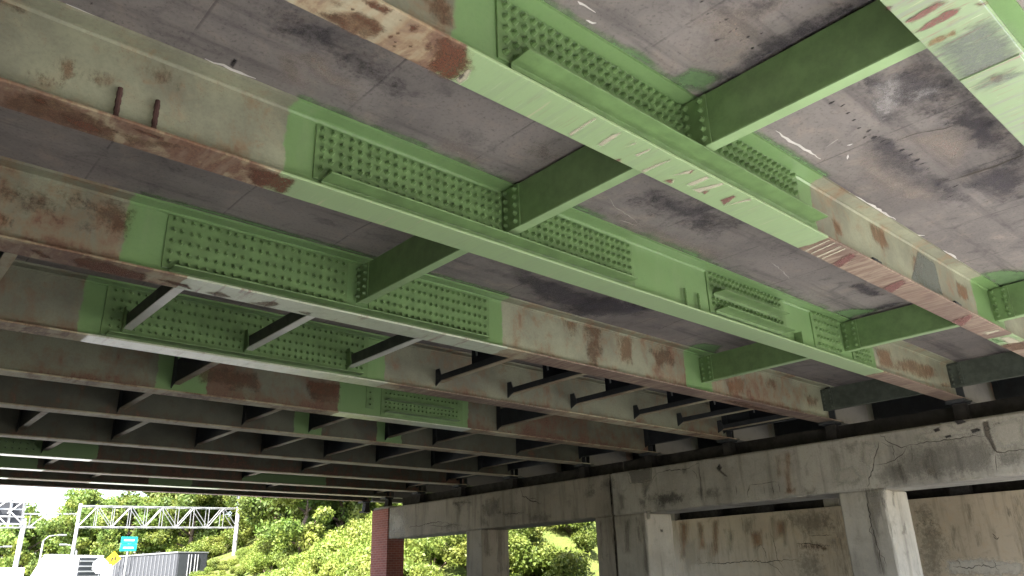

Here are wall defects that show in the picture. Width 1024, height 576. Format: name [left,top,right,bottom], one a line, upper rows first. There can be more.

rust [323,1,417,47]
rust [427,38,470,79]
rust [9,94,175,147]
rust [250,168,294,193]
rust [74,258,146,281]
rust [307,381,341,402]
crack [865,435,986,571]